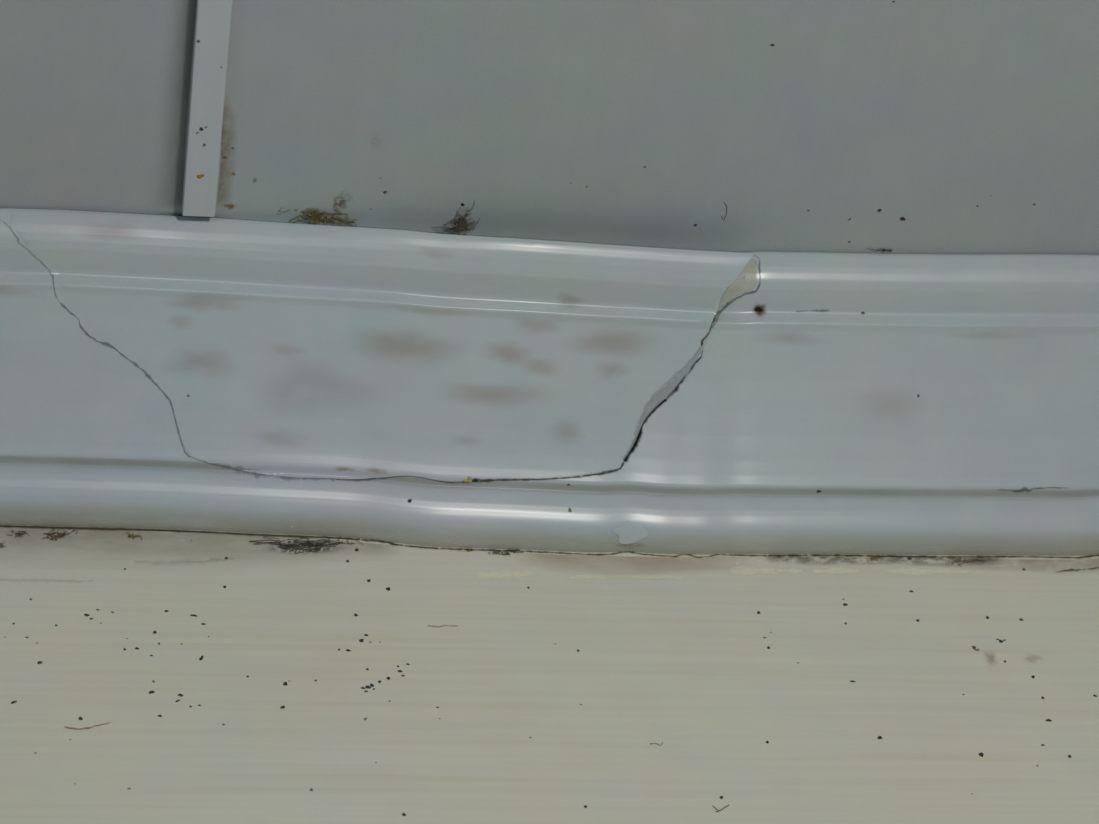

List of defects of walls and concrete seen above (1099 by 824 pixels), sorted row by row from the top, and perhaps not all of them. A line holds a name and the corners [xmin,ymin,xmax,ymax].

crack [336,262,761,483]